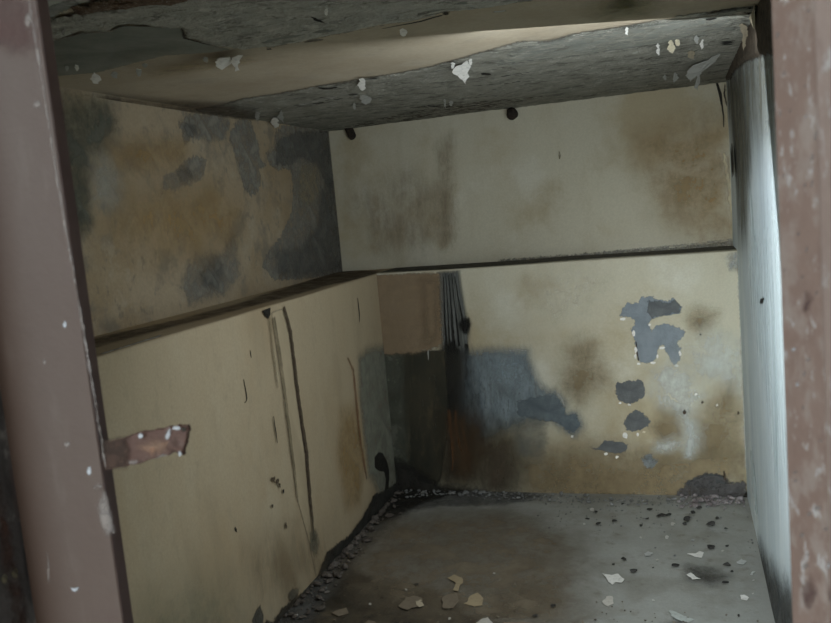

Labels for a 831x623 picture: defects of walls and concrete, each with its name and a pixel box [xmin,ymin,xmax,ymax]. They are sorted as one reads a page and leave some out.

flaking render [48,0,531,84]
leakage [63,99,249,225]
leakage [657,50,786,456]
peeling [620,296,685,367]
corrosion [103,437,129,470]
leakage [95,246,757,623]
peeling [463,349,581,440]
peeling [592,379,651,459]
leakage [761,552,793,623]